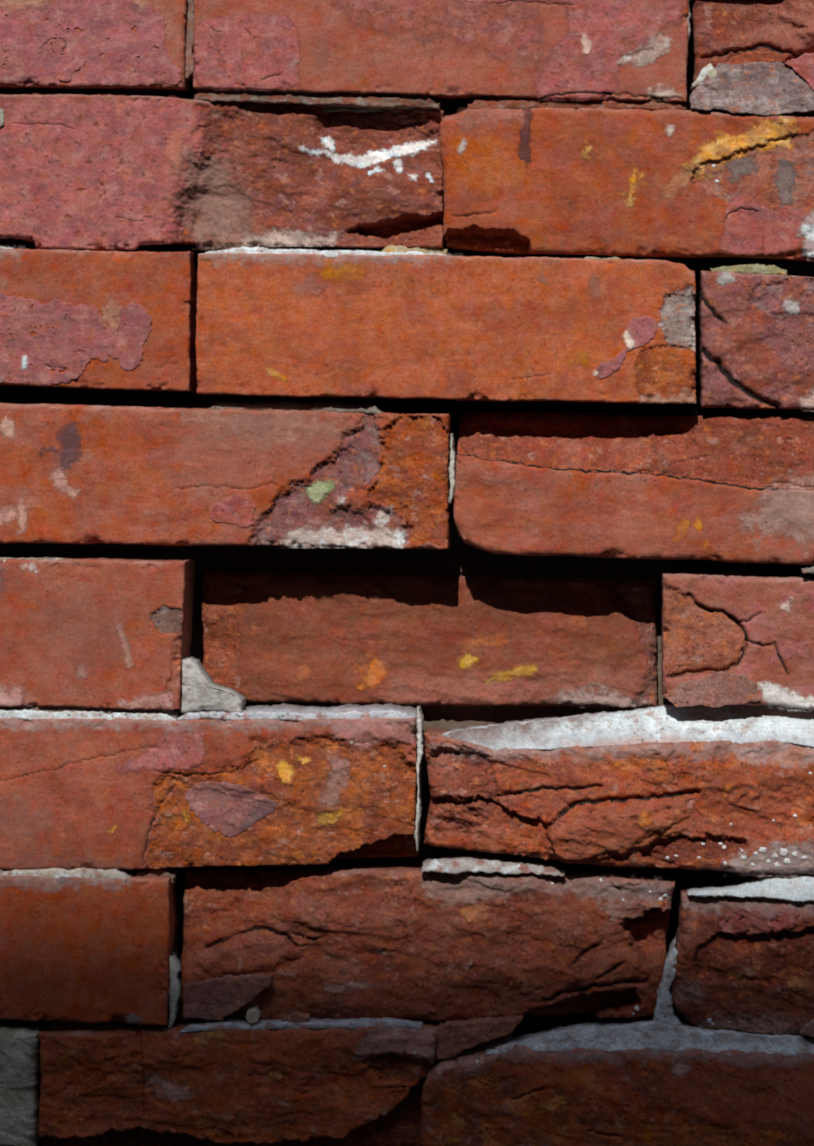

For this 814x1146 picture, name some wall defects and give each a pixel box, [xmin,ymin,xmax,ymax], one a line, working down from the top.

spalling [0,0,530,254]
peeling [0,292,152,386]
spalling [750,277,814,330]
spalling [209,285,814,547]
crack [670,594,788,678]
spalling [117,723,499,868]
spalling [41,1053,814,1146]